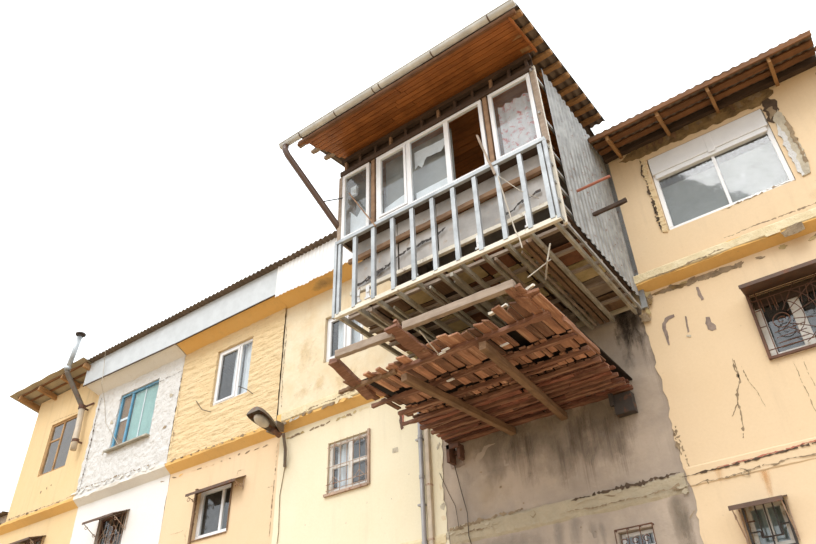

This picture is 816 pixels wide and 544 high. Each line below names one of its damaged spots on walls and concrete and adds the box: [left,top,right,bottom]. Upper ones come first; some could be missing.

spalling [619,88,811,232]
crack [640,161,662,230]
spalling [764,222,805,249]
spalling [639,261,744,322]
peeling [662,314,675,345]
crack [732,359,765,438]
crack [567,440,816,512]